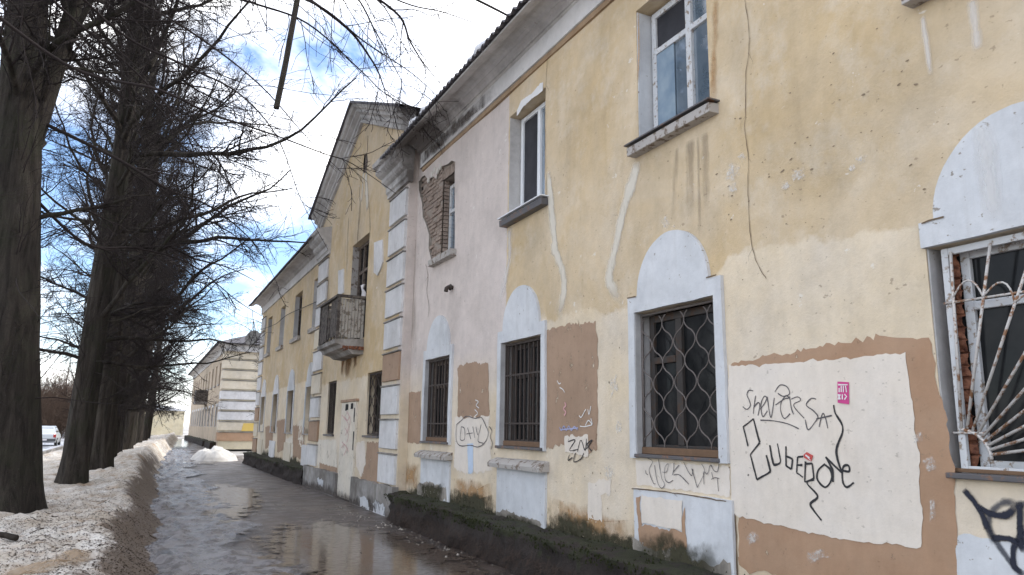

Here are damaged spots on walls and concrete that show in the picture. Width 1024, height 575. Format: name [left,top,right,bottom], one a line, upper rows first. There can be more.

spalling [419,161,455,259]
leakage [425,100,484,160]
crack [740,3,766,278]
flaking render [953,254,981,466]